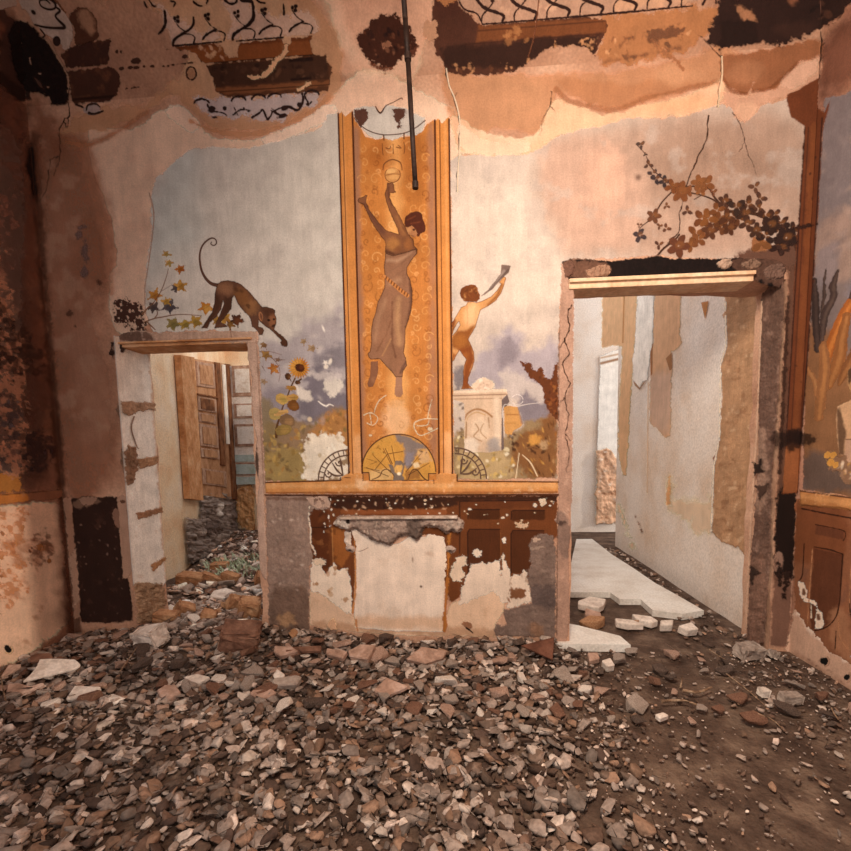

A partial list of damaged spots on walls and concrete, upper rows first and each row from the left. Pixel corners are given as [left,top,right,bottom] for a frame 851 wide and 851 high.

flaking render [7,20,70,105]
leakage [442,20,851,133]
flaking render [0,276,31,476]
leakage [0,0,343,634]
flaking render [87,0,822,644]
flaking render [0,496,97,671]